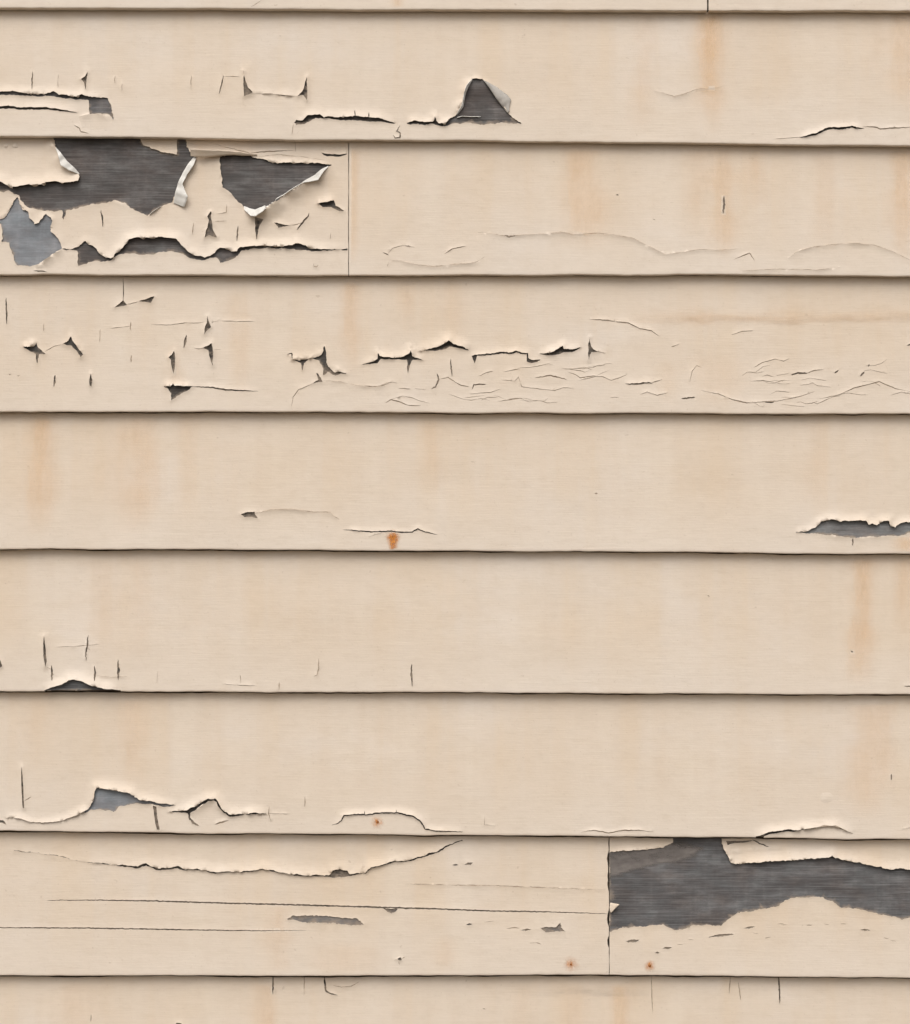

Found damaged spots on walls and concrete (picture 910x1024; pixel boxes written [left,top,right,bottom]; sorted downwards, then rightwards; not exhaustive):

crack [777,126,909,139]
peeling [0,79,521,266]
crack [289,319,910,407]
peeling [800,519,910,546]
peeling [46,680,114,690]
peeling [35,788,279,830]
peeling [609,838,910,942]
peeling [288,915,363,925]